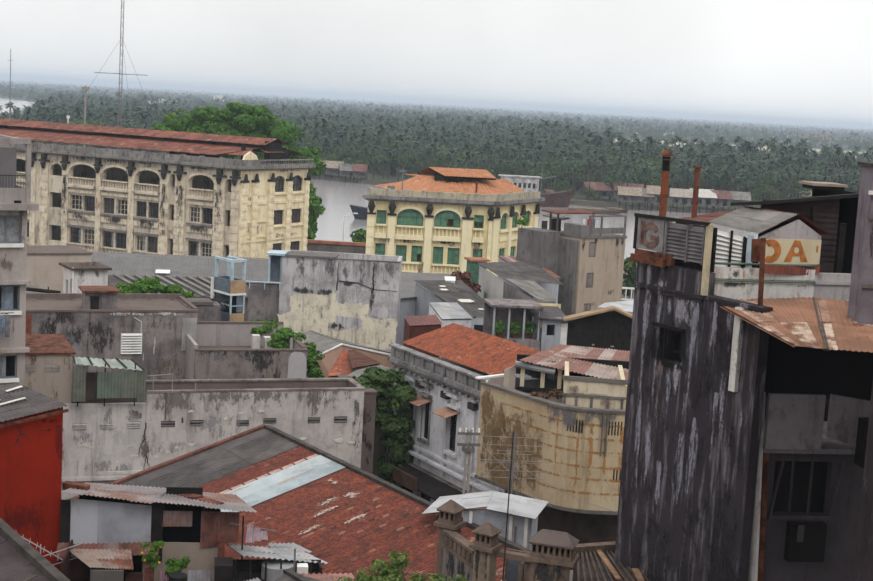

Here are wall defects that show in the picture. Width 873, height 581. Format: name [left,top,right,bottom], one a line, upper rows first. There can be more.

water stain [294,257,395,309]
water stain [110,312,182,374]
peeling [277,291,398,378]
water stain [56,425,64,467]
water stain [138,432,187,457]
water stain [156,391,287,439]
water stain [298,390,372,465]
rust [503,404,624,496]
water stain [635,265,699,515]
water stain [709,302,746,468]